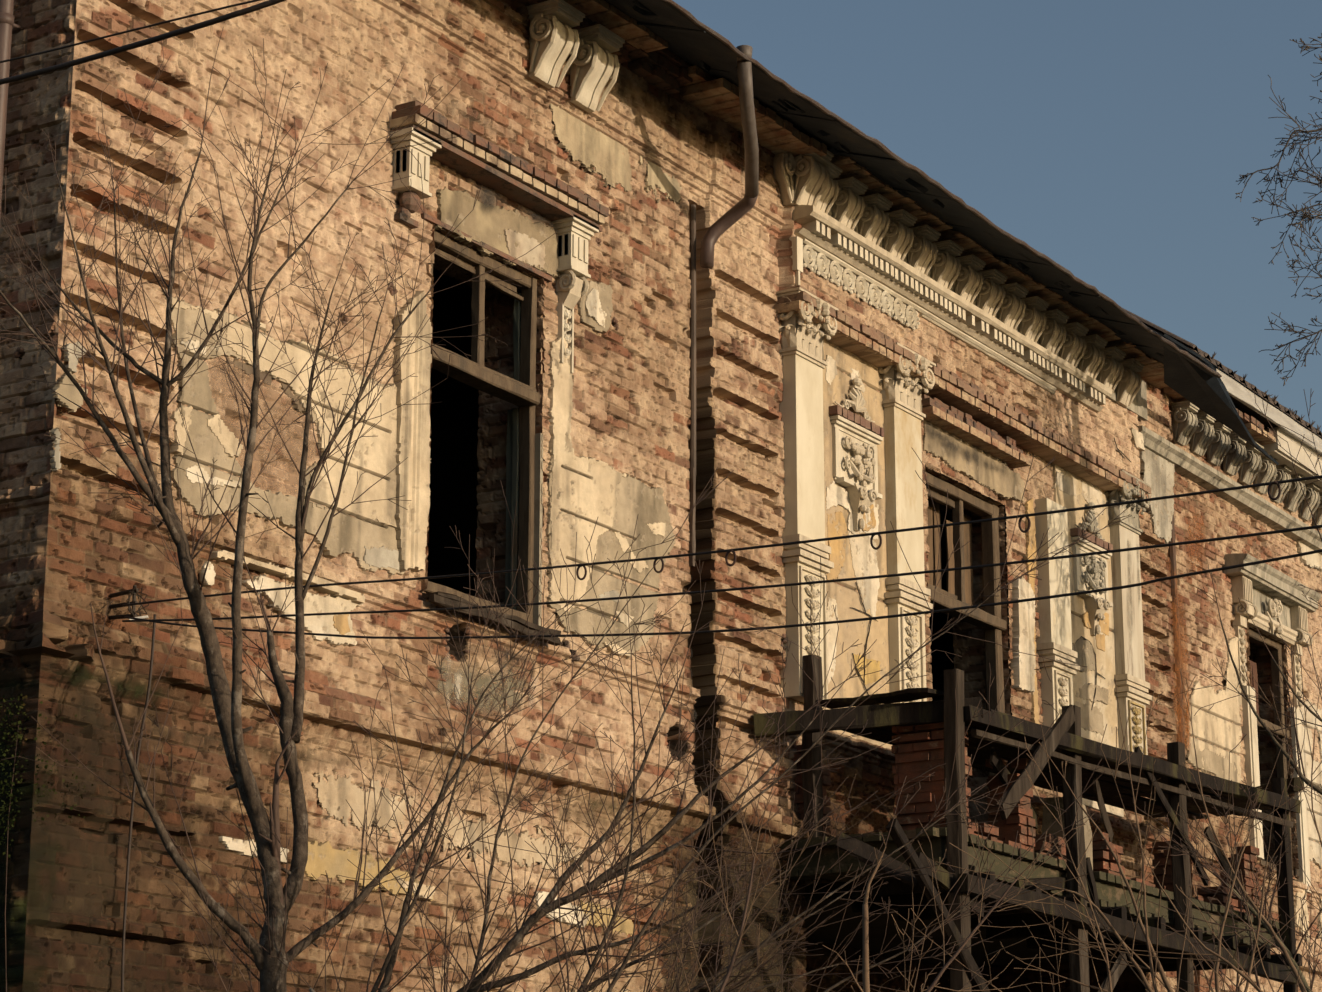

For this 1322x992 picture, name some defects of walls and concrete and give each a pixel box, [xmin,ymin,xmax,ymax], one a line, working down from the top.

peeling [162,282,432,576]
peeling [545,337,676,662]
peeling [218,836,258,858]
peeling [304,771,436,901]
peeling [418,809,583,873]
peeling [532,891,634,936]
peeling [1185,636,1243,783]
peeling [1293,879,1322,944]
peeling [1301,680,1322,869]